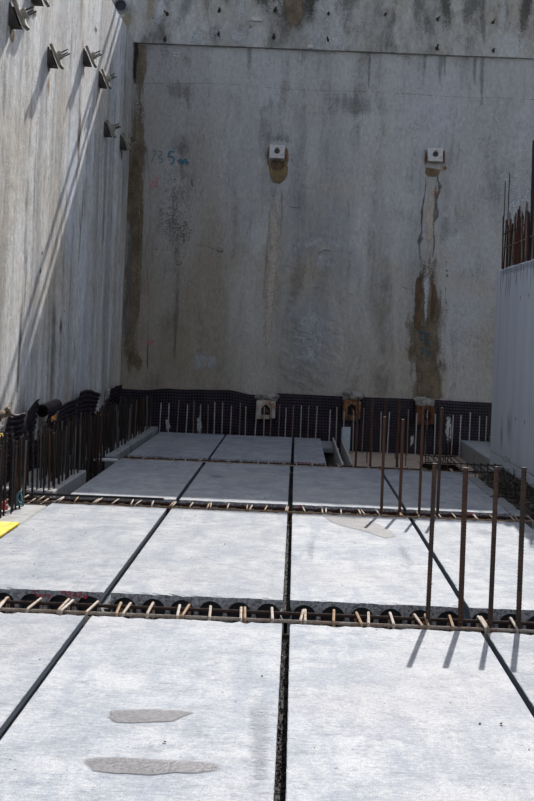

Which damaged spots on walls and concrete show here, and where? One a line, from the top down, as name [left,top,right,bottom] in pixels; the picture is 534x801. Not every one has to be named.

water stain [257,0,316,35]
water stain [519,0,532,41]
rust [267,150,288,183]
water stain [123,43,147,369]
rust [417,154,447,261]
water stain [325,516,395,538]
water stain [109,709,192,723]
water stain [86,757,218,775]